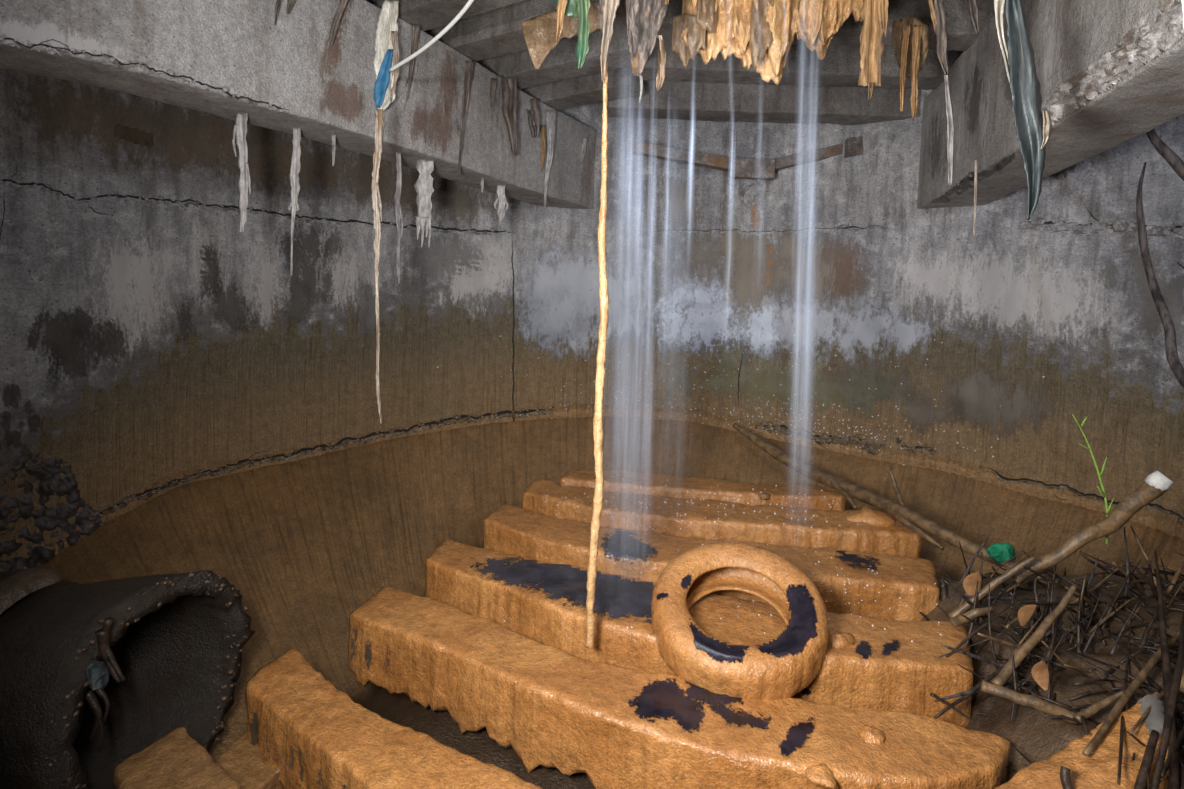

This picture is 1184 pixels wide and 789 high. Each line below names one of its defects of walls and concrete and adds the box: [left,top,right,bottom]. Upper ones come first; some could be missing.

crack [0,35,290,114]
leakage [11,76,419,382]
crack [0,158,555,524]
leakage [400,176,1184,435]